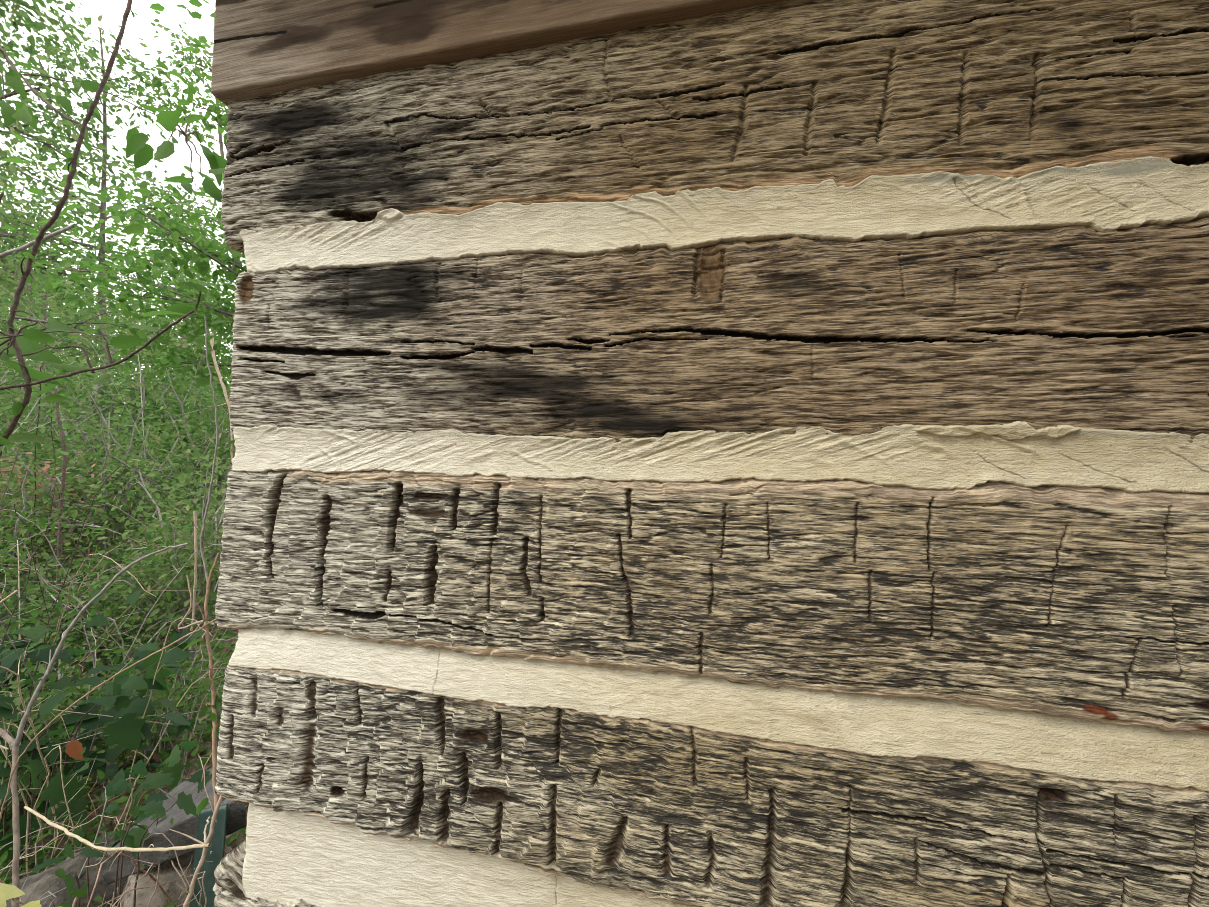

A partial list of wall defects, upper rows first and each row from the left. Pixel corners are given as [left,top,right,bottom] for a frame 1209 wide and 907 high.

water stain [253,103,346,140]
water stain [439,122,464,133]
water stain [276,141,444,209]
water stain [308,264,465,319]
crack [238,327,1209,380]
water stain [451,364,684,434]